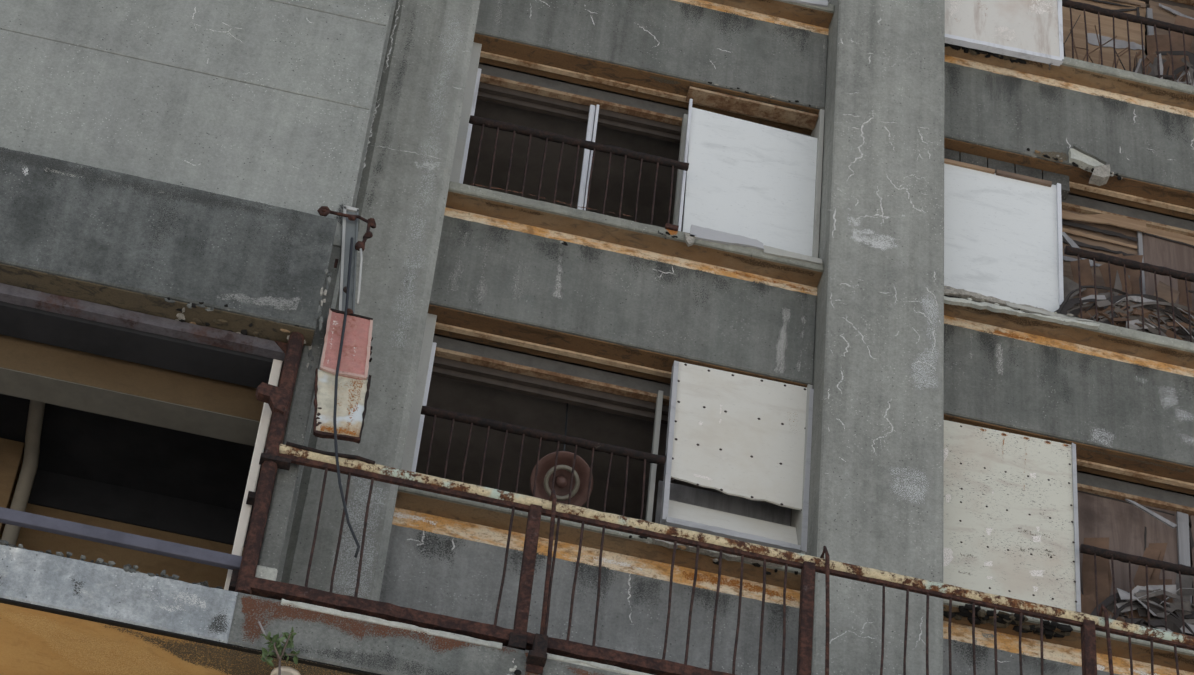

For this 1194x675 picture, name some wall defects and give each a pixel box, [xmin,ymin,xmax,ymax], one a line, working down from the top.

damp [0,148,301,278]
crack [832,92,932,238]
spalling [944,144,1122,200]
crack [825,272,941,430]
crack [871,399,895,456]
damp [101,589,259,675]
damp [282,644,458,675]
corrosion [240,595,538,675]